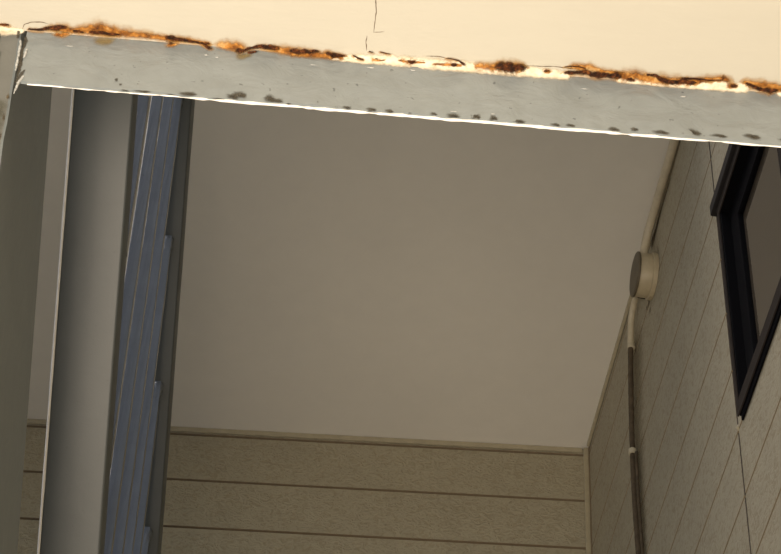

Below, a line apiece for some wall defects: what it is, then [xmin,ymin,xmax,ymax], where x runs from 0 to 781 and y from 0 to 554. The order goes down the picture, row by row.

corrosion [28,24,390,61]
corrosion [398,58,465,67]
peeling [330,54,570,80]
corrosion [475,62,526,73]
corrosion [564,65,781,93]